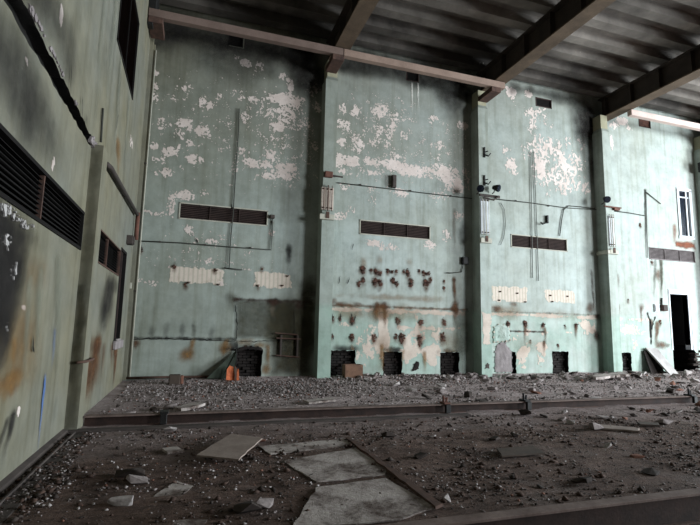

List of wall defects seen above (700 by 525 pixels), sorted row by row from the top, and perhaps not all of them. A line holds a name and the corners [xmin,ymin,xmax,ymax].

peeling [505,86,533,106]
peeling [150,70,321,189]
peeling [336,87,470,207]
peeling [503,145,519,175]
peeling [521,107,591,196]
peeling [144,173,214,218]
rust [357,266,414,287]
rust [369,303,413,320]
peeling [332,307,466,371]
rust [422,278,465,341]
spalling [481,311,568,373]
peeling [565,315,599,335]